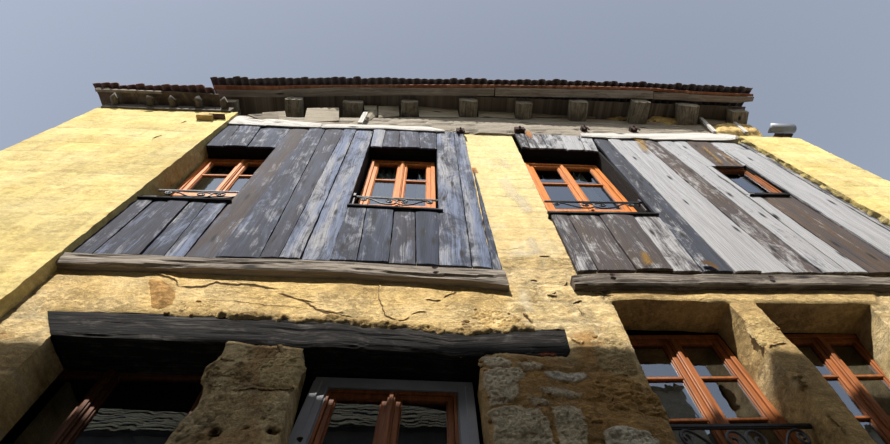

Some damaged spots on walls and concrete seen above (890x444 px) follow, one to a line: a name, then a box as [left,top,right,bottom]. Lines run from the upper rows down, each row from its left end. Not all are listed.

crack [155,273,357,318]
crack [377,282,461,321]
spalling [478,335,670,444]